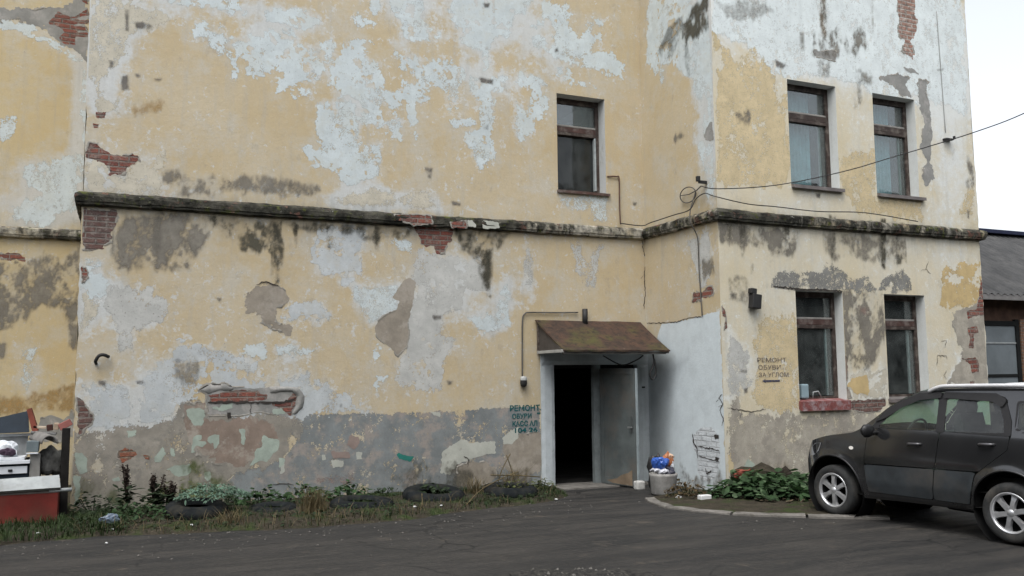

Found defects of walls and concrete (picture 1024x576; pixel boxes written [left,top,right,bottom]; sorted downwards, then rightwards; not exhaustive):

peeling [646,0,968,206]
water stain [163,171,210,196]
water stain [223,176,320,196]
peeling [0,0,625,393]
water stain [112,212,216,270]
flaking render [38,281,370,511]
water stain [241,222,329,267]
crack [642,241,703,324]
water stain [718,222,796,256]
flaking render [687,232,888,485]
water stain [827,219,906,268]
flaking render [940,261,988,384]